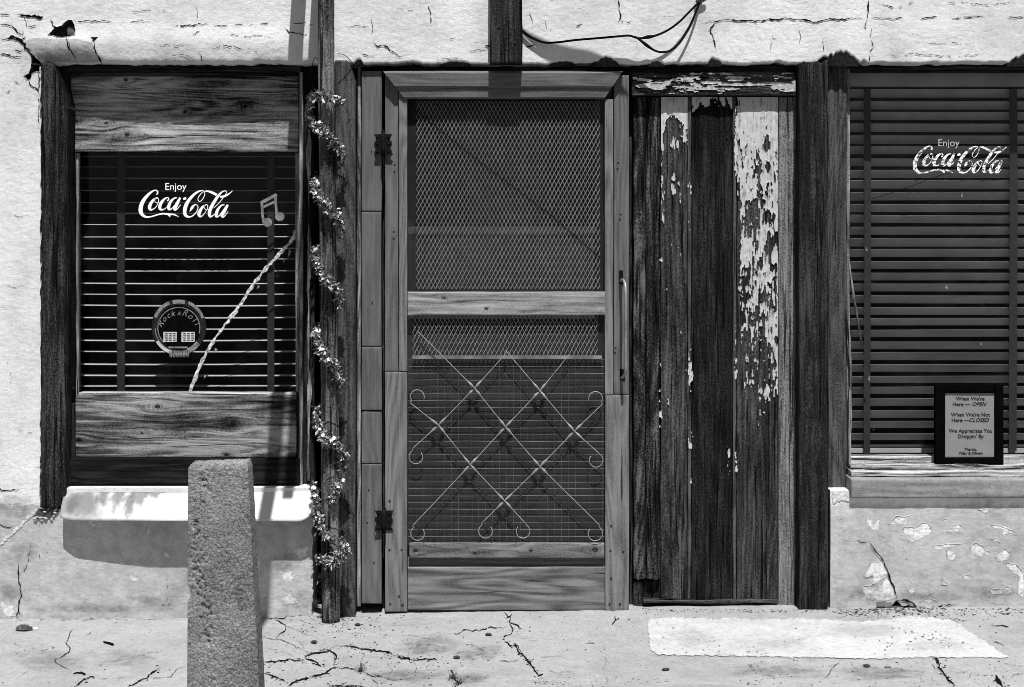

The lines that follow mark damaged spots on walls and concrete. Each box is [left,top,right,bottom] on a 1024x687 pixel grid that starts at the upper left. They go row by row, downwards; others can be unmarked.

spalling [23,55,42,80]
spalling [48,19,76,38]
crack [698,0,1023,61]
peeling [633,58,796,426]
peeling [862,561,935,608]
crack [834,540,964,621]
peeling [867,515,1024,597]
crack [264,612,566,687]